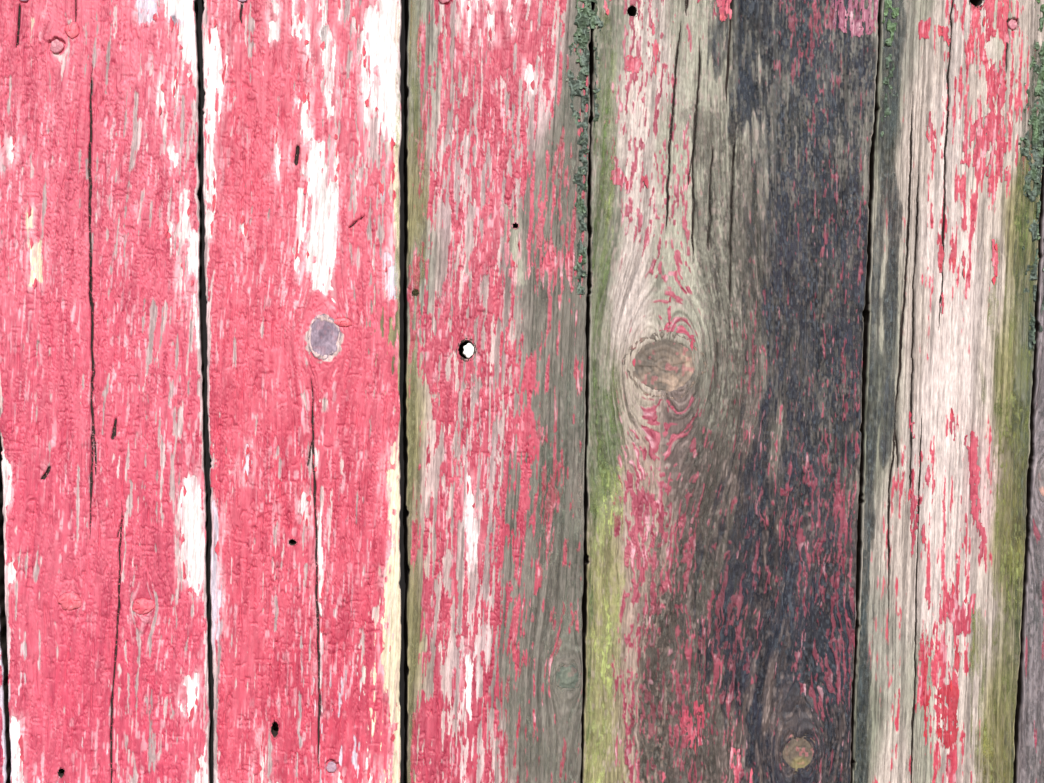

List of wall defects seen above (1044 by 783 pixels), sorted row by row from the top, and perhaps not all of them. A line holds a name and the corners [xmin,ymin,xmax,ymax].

crack [88,65,117,533]
peeling [135,0,228,347]
peeling [268,0,401,302]
peeling [2,452,12,507]
peeling [10,717,24,783]
crack [110,516,123,783]
peeling [178,473,222,644]
peeling [298,487,325,711]
crack [307,378,321,767]
peeling [381,442,400,783]
peeling [923,578,976,749]
peeling [949,408,987,558]